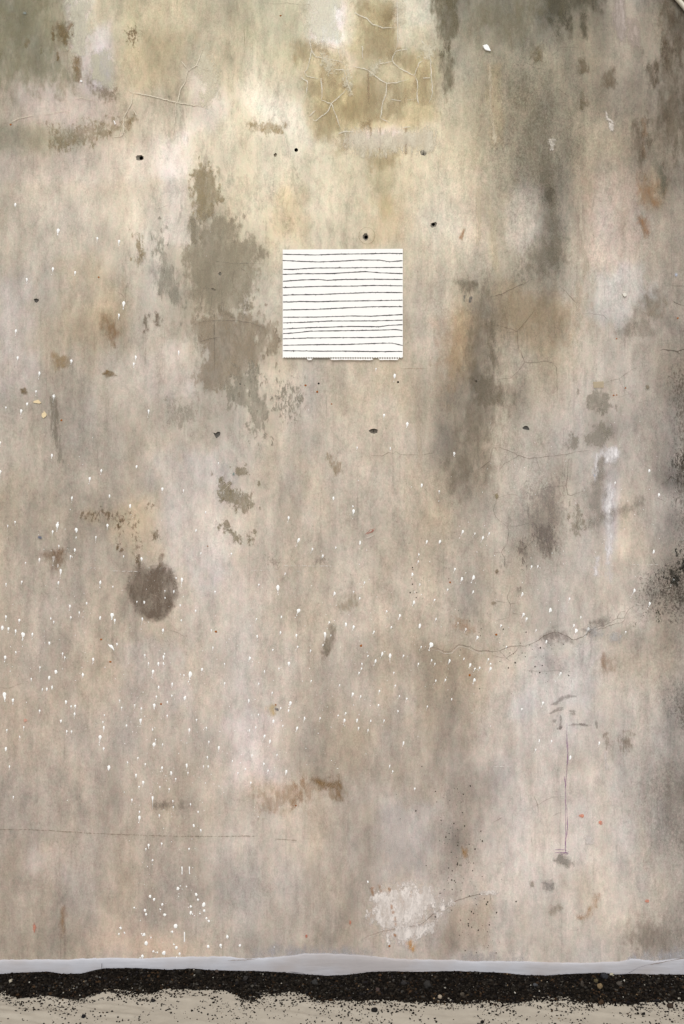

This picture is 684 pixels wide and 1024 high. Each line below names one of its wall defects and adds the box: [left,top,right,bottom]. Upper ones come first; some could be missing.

crack [301,4,433,134]
leakage [129,555,177,620]
crack [419,605,643,658]